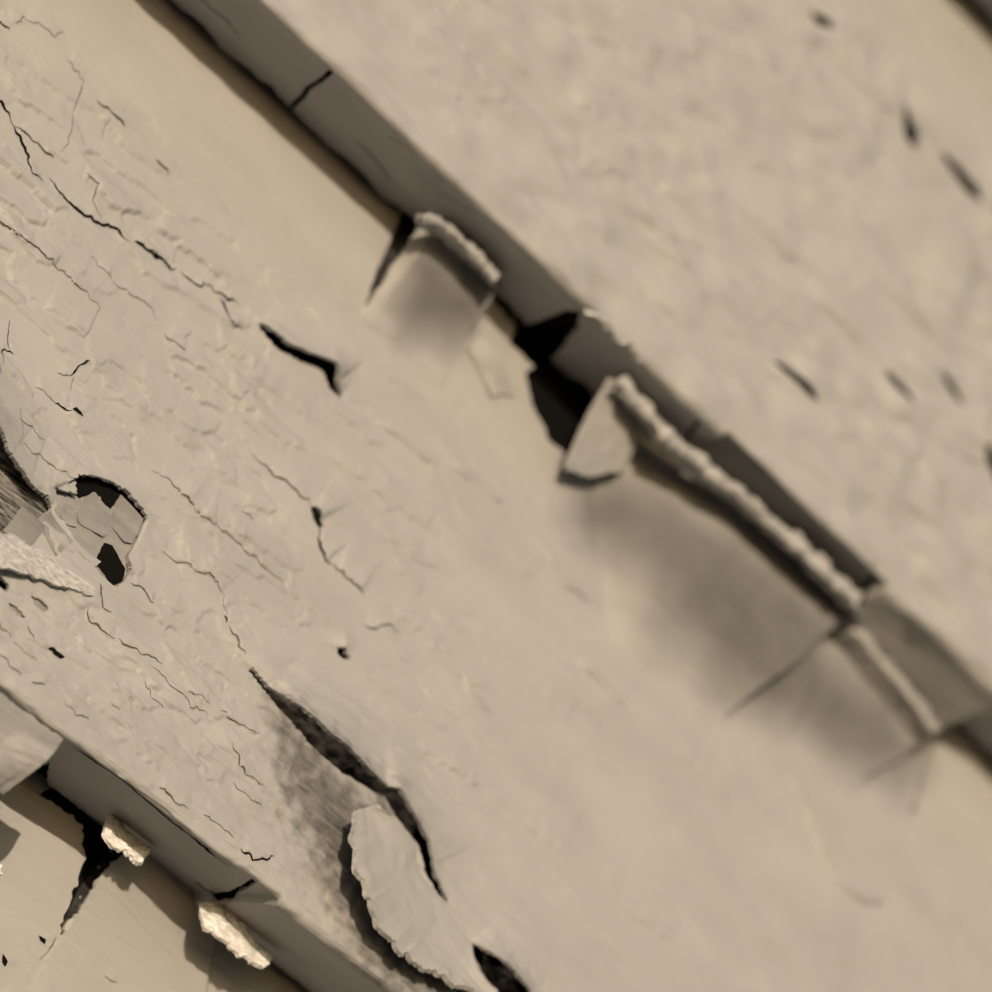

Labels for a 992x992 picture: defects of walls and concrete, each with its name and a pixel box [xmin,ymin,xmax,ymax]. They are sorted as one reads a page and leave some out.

crack [0,16,61,37]
crack [0,60,337,416]
peeling [415,213,501,287]
crack [20,408,76,481]
peeling [0,435,143,597]
crack [155,472,282,581]
crack [253,455,364,594]
crack [0,625,65,685]
crack [165,553,246,654]
crack [35,767,108,959]
peeling [291,742,498,992]